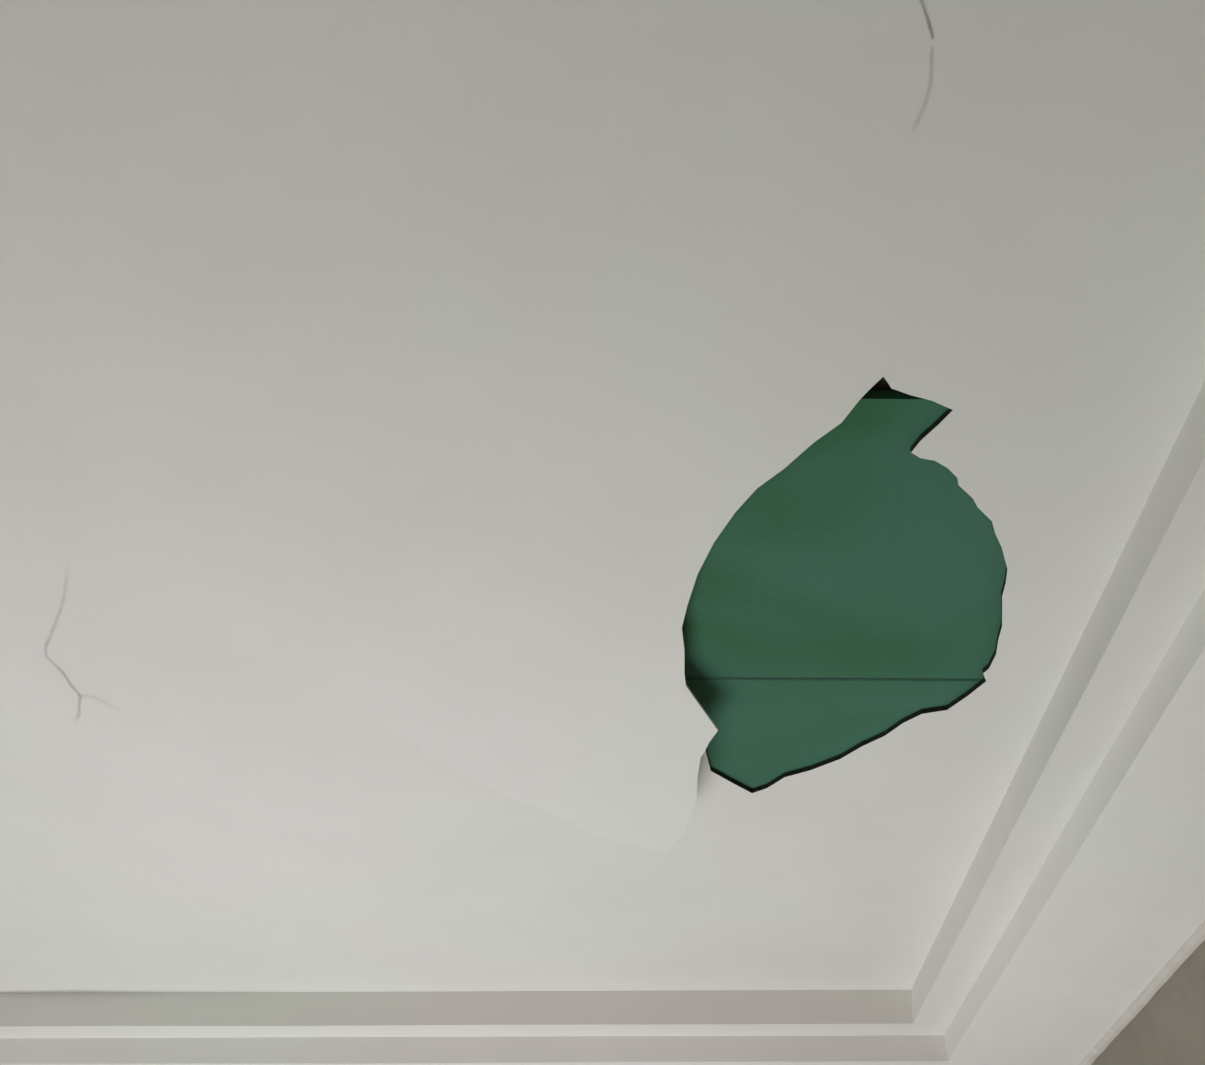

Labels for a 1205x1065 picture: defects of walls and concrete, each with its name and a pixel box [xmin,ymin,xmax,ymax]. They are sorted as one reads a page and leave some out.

peeling [350,378,1007,852]